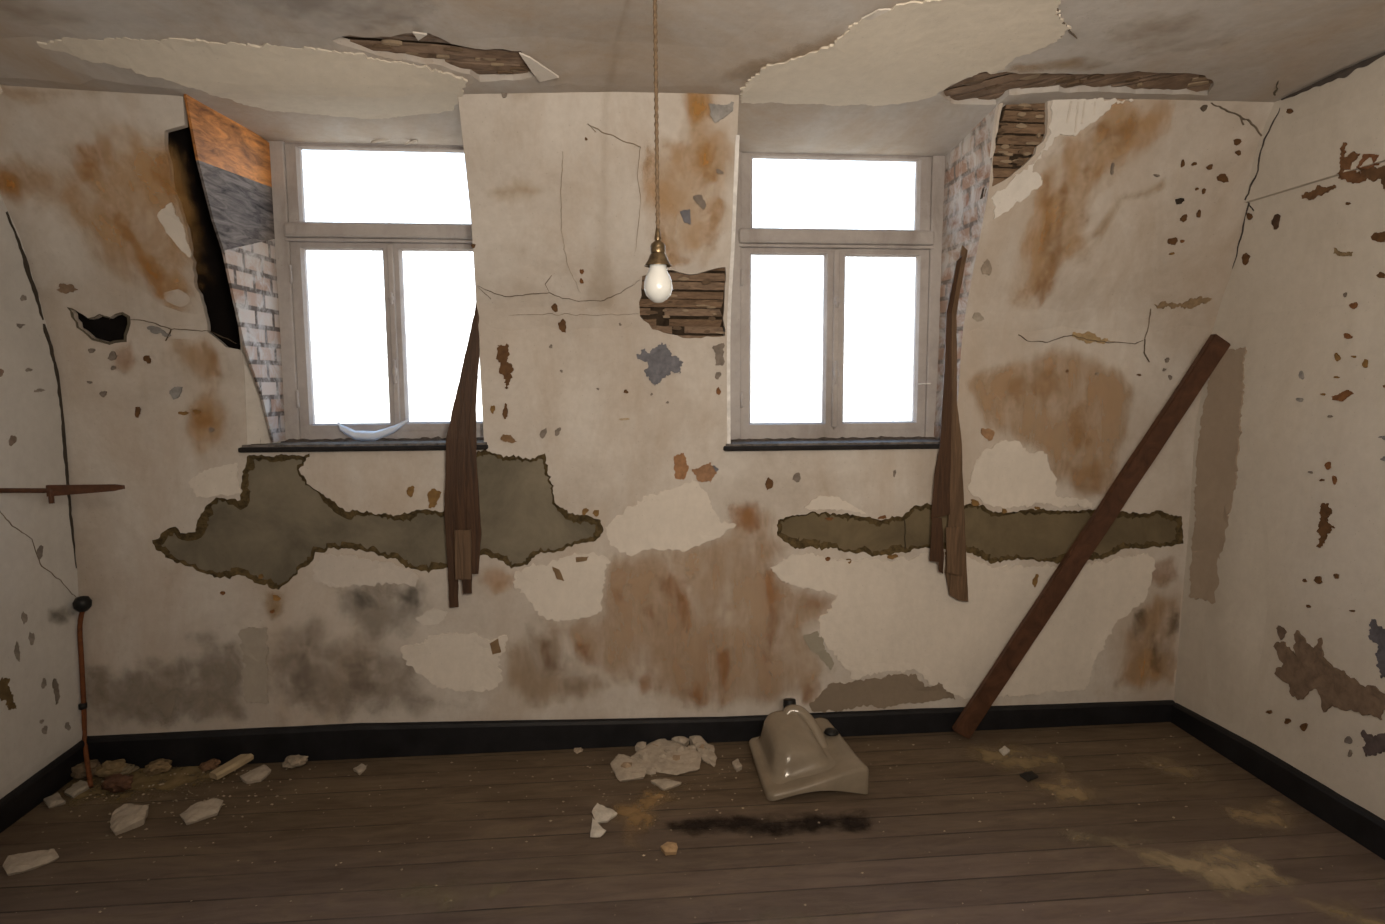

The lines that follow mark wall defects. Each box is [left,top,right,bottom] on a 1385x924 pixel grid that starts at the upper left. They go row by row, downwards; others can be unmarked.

peeling [37,31,559,119]
peeling [708,0,1213,219]
crack [1211,52,1385,269]
crack [0,211,77,597]
spalling [152,443,448,613]
spalling [477,343,736,622]
spalling [636,268,725,404]
damp [574,508,817,702]
peeling [770,428,1095,713]
damp [975,356,1127,487]
peeling [998,347,1247,698]
peeling [1273,619,1385,757]